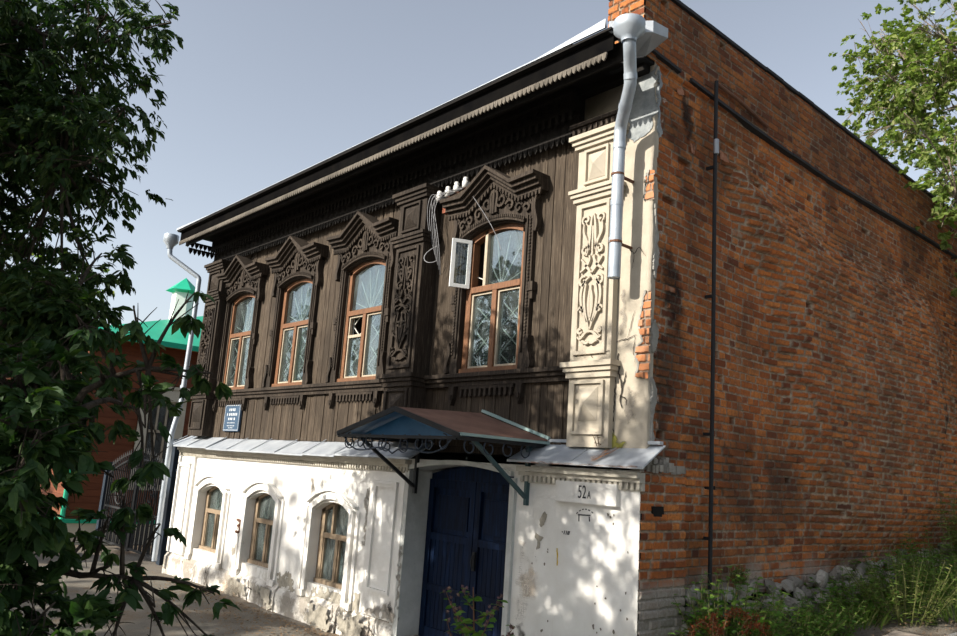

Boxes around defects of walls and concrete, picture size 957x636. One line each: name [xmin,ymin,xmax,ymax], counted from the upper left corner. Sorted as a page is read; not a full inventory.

flaking render [642,170,655,201]
flaking render [634,290,652,379]
peeling [224,571,295,610]
peeling [303,586,364,636]